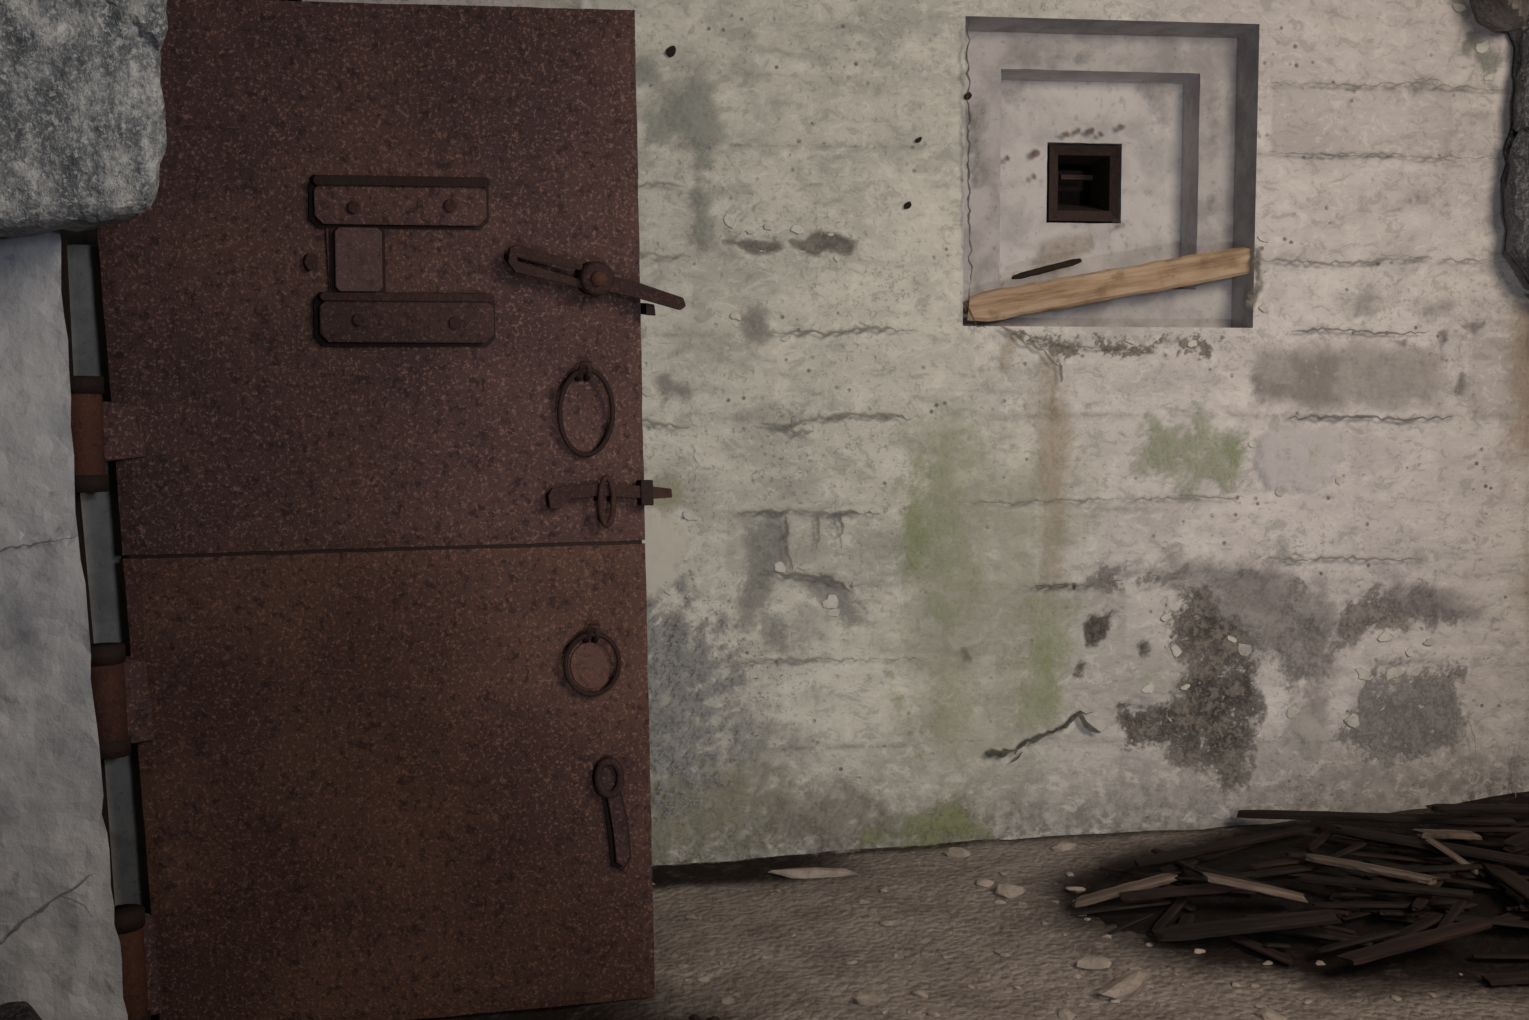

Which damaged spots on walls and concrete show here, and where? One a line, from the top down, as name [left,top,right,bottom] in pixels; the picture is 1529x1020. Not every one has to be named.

spalling [1452,0,1500,81]
spalling [1062,124,1125,137]
spalling [724,214,854,262]
spalling [1247,235,1269,312]
spalling [1010,330,1225,362]
crack [737,509,879,592]
damp [1159,544,1349,720]
crack [985,711,1101,763]